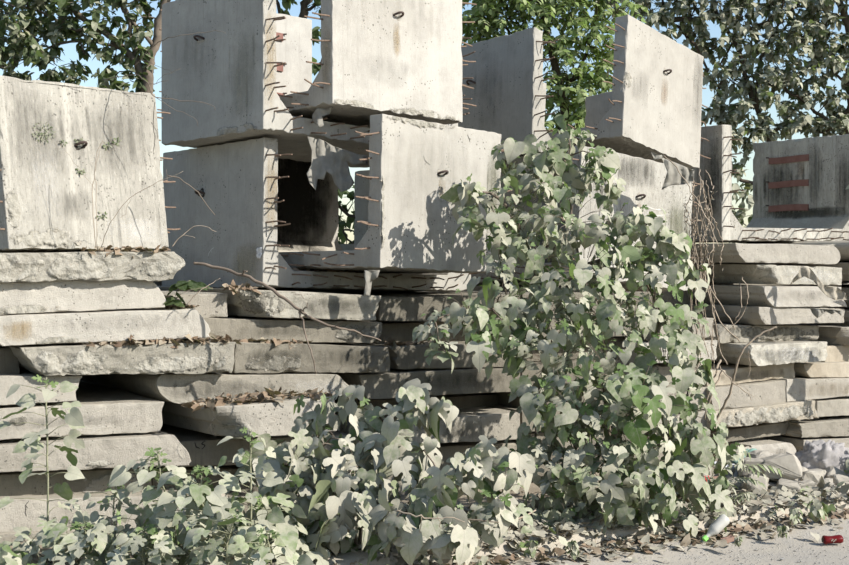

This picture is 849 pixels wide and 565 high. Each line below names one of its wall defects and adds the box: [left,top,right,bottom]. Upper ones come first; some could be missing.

spalling [0,190,114,282]